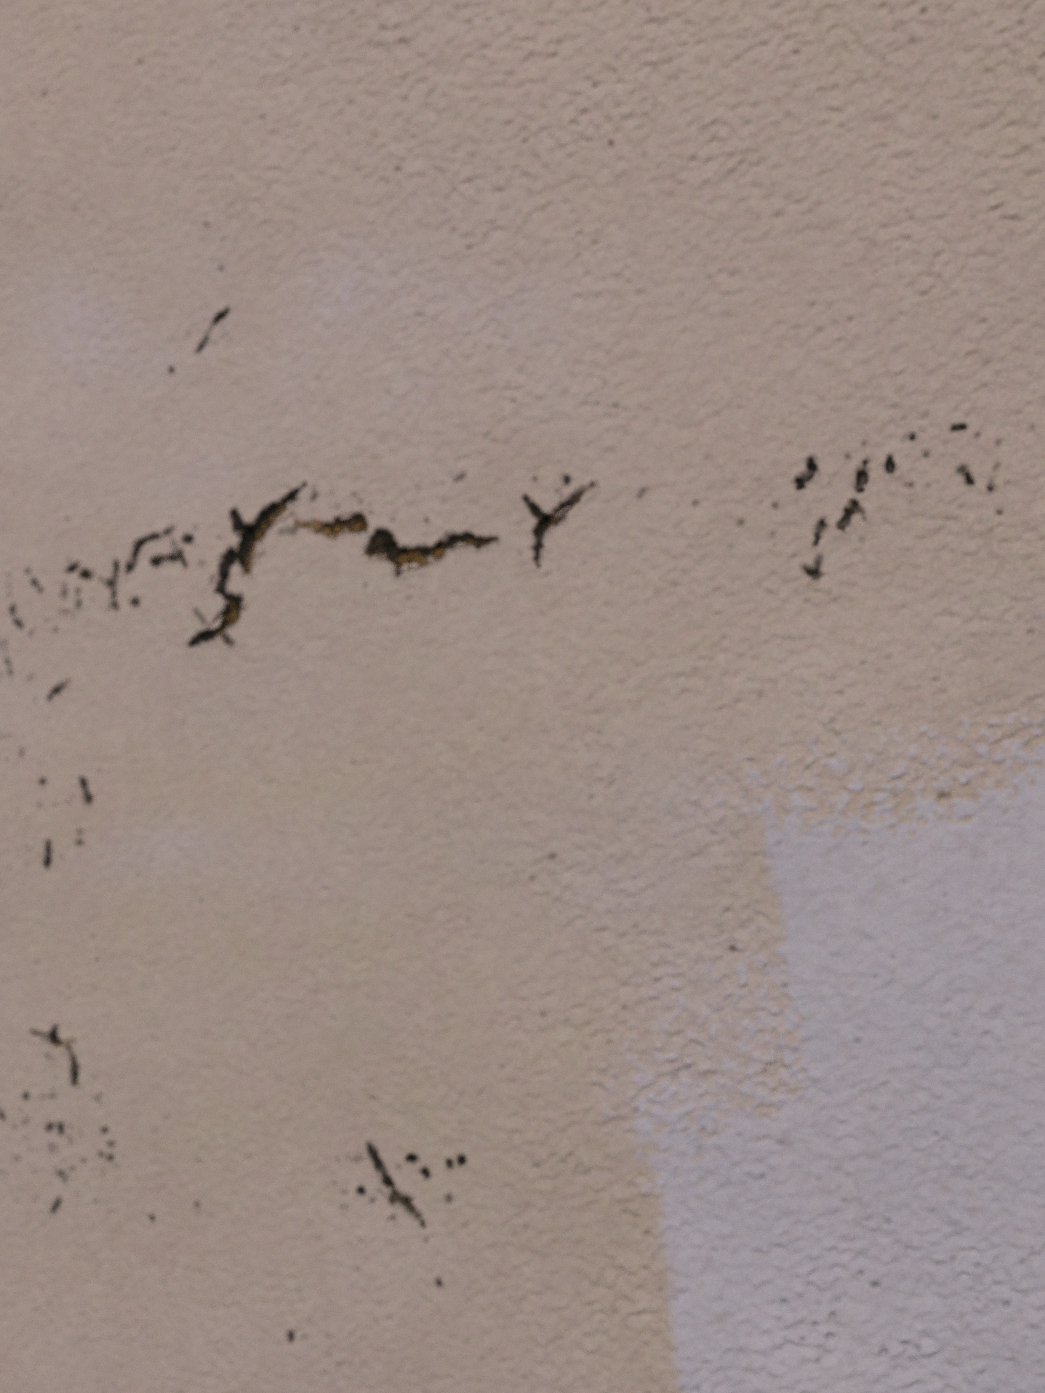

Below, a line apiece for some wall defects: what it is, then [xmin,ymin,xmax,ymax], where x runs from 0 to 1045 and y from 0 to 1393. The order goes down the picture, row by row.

crack [196,308,229,352]
crack [795,457,818,489]
crack [125,533,161,574]
crack [188,482,498,647]
crack [522,482,595,567]
crack [803,455,895,579]
crack [48,684,65,700]
crack [31,1025,79,1085]
crack [367,1143,425,1227]